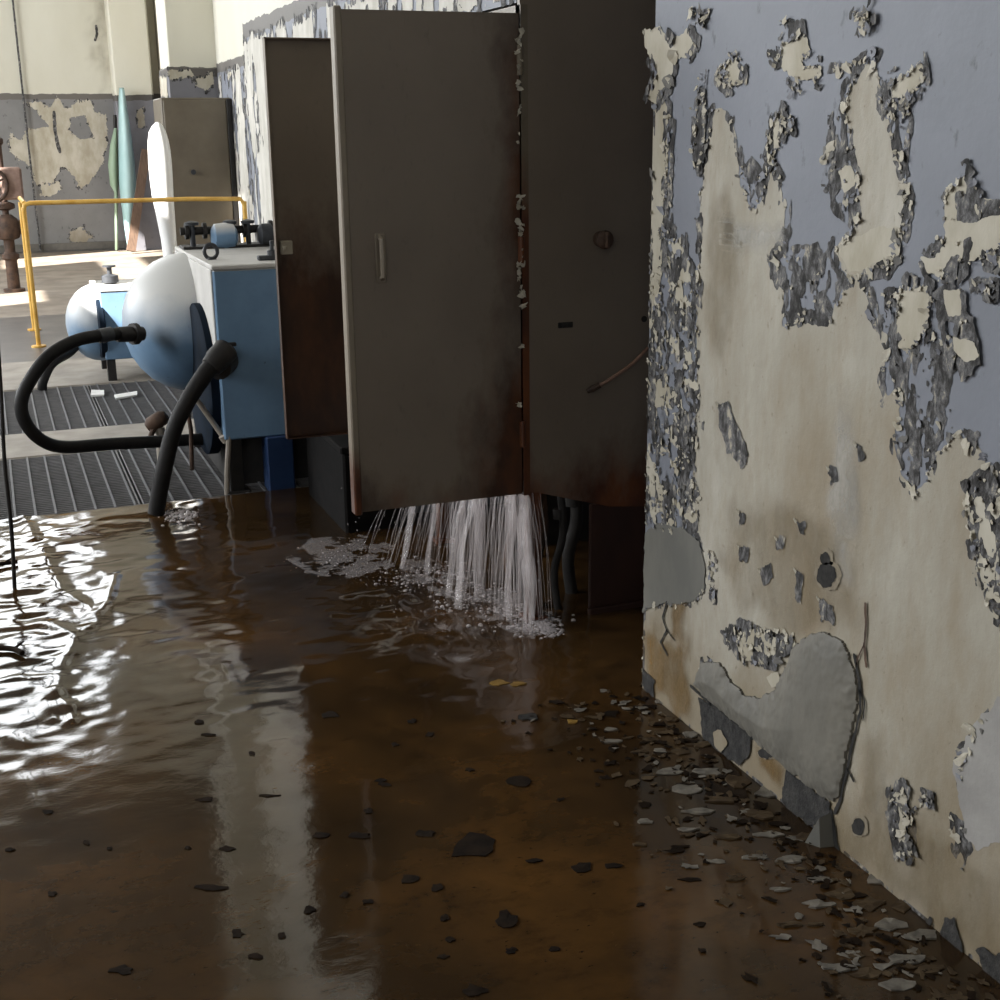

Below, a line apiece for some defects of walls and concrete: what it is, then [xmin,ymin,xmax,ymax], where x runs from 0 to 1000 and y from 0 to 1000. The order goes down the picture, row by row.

peeling [7,95,110,197]
peeling [159,0,482,242]
peeling [641,0,1000,983]
crack [660,601,675,656]
crack [829,602,867,850]